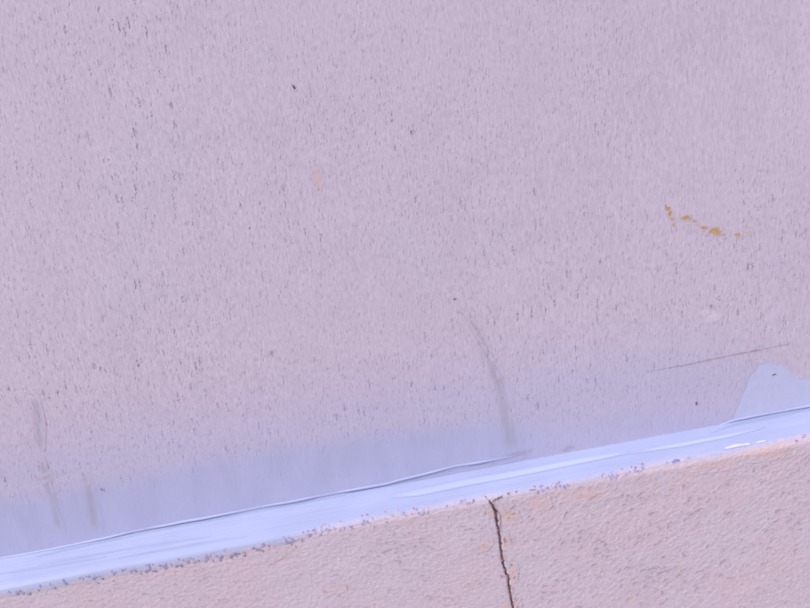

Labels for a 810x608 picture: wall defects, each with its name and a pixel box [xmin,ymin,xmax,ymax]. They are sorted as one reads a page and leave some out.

crack [484,489,536,608]